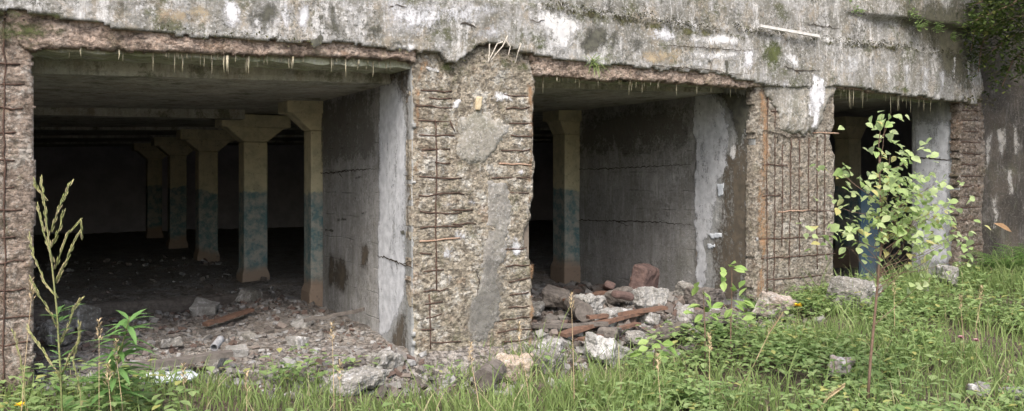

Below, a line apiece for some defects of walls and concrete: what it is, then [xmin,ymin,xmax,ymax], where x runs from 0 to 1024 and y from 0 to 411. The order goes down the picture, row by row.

water stain [224,0,355,47]
water stain [389,2,494,30]
water stain [529,10,617,54]
water stain [653,28,674,40]
water stain [690,34,753,76]
water stain [901,2,978,91]
spalling [835,86,883,94]
spalling [891,94,986,270]
spalling [0,9,839,400]
water stain [329,256,348,292]
water stain [361,245,369,267]
crack [377,255,414,269]